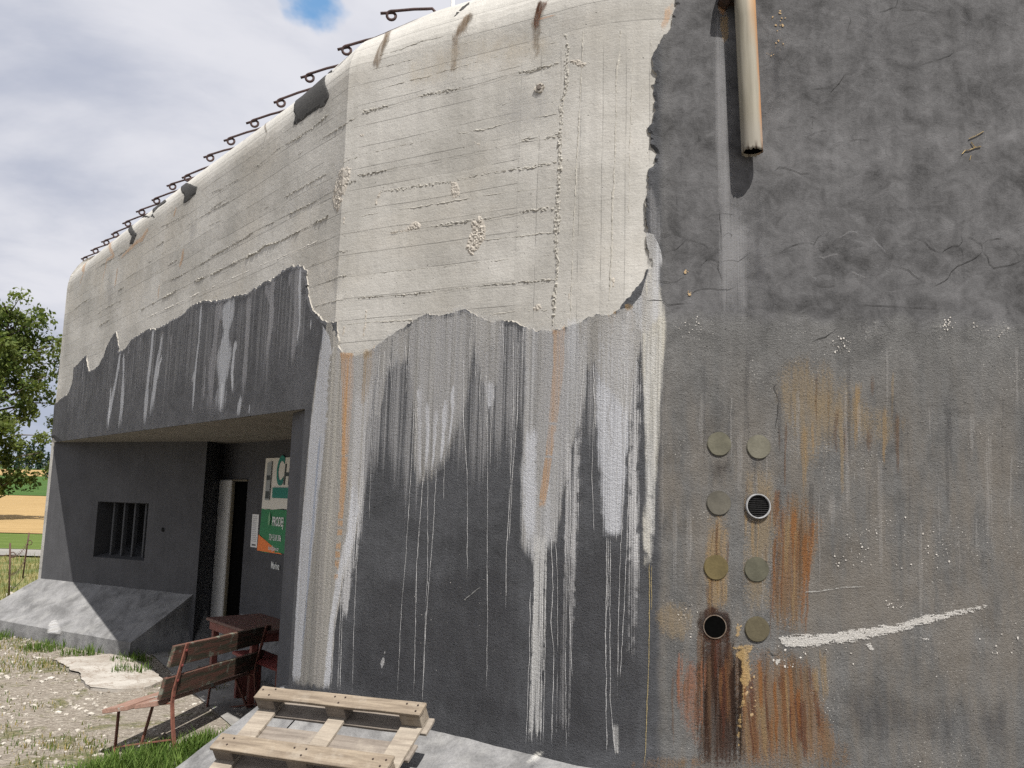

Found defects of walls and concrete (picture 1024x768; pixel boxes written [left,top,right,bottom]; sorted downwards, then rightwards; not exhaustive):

water stain [108,347,129,422]
water stain [150,337,163,407]
water stain [203,299,251,413]
corrosion [335,352,353,566]
peeling [56,0,676,402]
water stain [293,309,501,687]
corrosion [540,331,563,501]
water stain [506,233,665,739]
crack [658,213,747,305]
crack [873,234,1023,328]
corrosion [697,607,752,766]